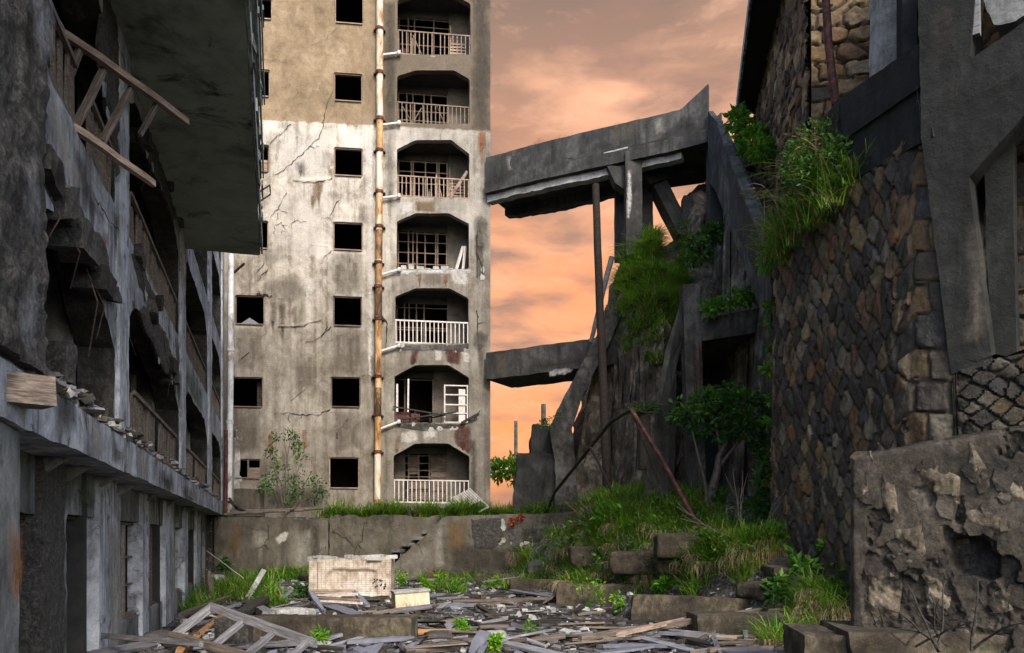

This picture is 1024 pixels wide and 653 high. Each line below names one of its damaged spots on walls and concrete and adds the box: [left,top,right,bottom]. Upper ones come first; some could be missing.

crack [271,91,340,237]
crack [237,319,331,363]
crack [264,390,349,458]
rust [455,427,469,453]
spalling [853,443,1024,628]